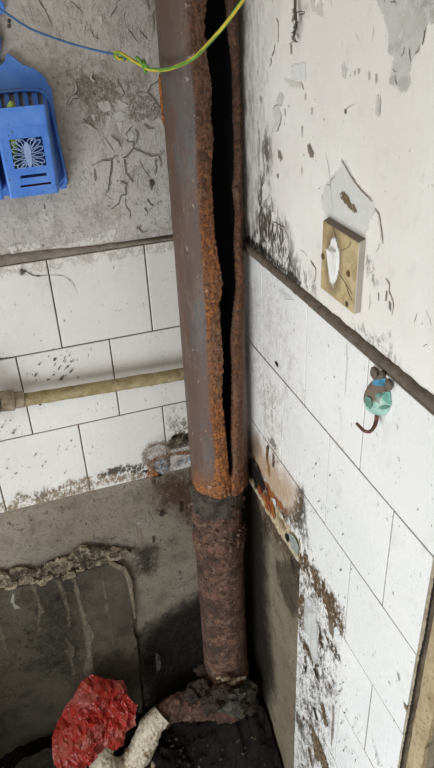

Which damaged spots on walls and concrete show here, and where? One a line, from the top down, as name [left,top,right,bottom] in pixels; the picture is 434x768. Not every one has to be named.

peeling [377,0,434,91]
crack [118,78,161,108]
crack [83,118,164,233]
mould [245,136,307,286]
peeling [340,191,357,213]
peeling [148,444,191,474]
corrosion [154,477,192,516]
corrosion [255,462,287,513]
spalling [0,543,136,618]
efflorescence [56,577,94,676]
damp [278,490,345,766]